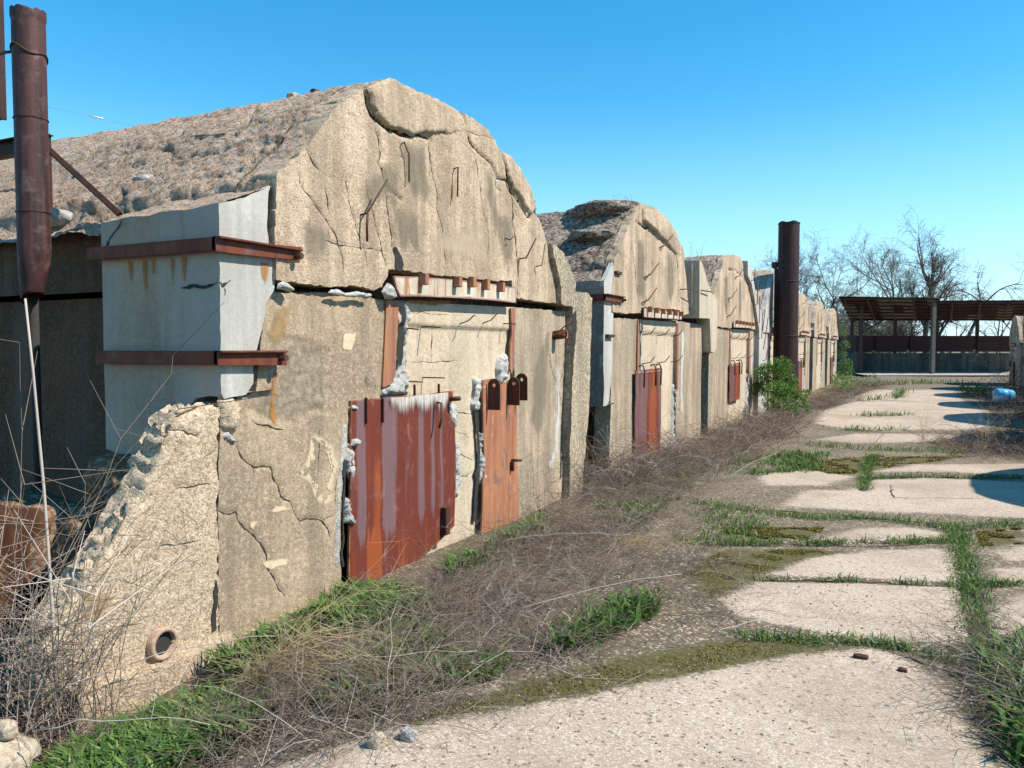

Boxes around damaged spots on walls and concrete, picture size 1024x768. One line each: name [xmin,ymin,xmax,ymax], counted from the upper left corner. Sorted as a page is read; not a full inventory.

crack [298,90,446,273]
crack [459,111,539,296]
crack [182,280,231,294]
crack [619,210,680,370]
corrosion [270,373,278,424]
spalling [329,283,509,498]
crack [218,510,286,596]
crack [236,426,346,567]
peeling [300,424,361,564]